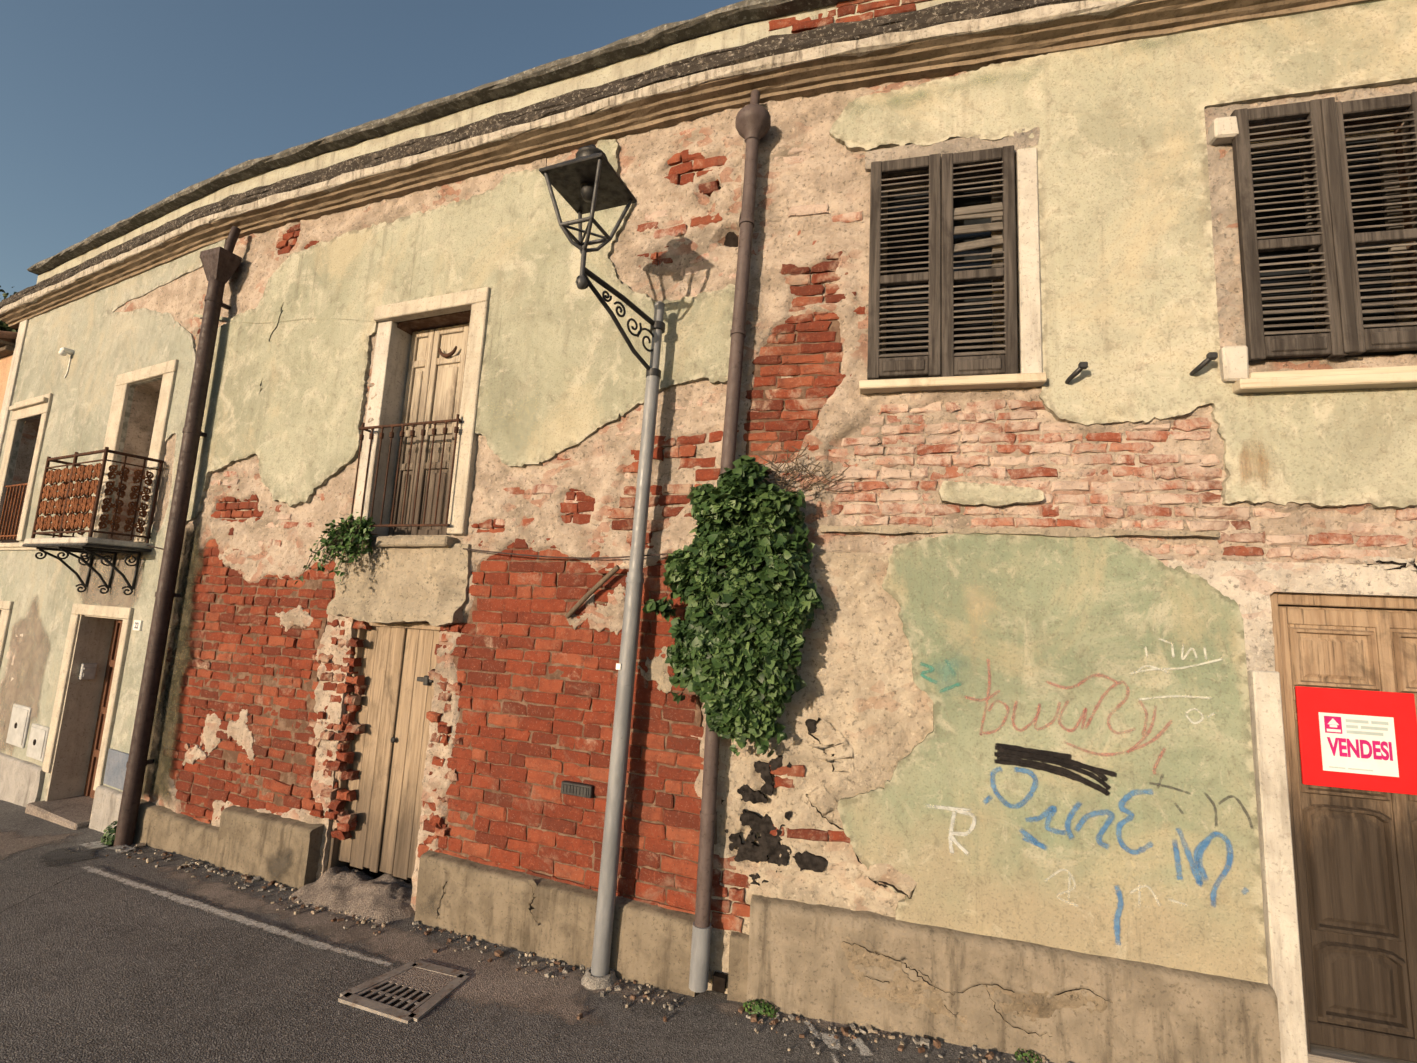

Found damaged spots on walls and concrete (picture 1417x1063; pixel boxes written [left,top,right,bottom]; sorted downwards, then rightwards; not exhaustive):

flaking render [115,144,597,351]
crack [194,302,375,394]
flaking render [410,70,1417,994]
flaking render [141,334,380,881]
crack [528,880,541,926]
crack [840,937,1114,1037]
spalling [983,984,1109,1026]